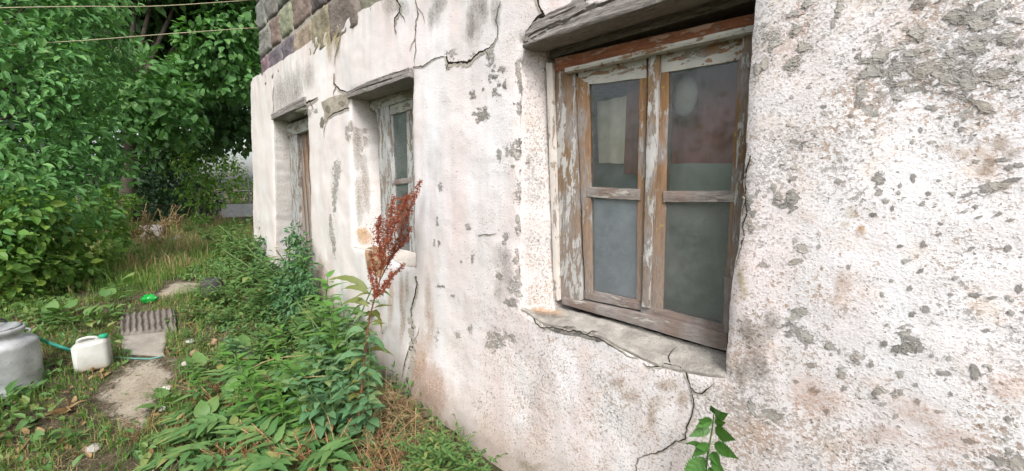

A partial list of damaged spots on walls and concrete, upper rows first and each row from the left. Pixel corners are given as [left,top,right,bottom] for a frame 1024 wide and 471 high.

crack [305,24,349,139]
crack [394,0,501,70]
peeling [468,42,527,124]
peeling [846,0,1024,132]
peeling [329,157,343,254]
crack [735,155,753,268]
peeling [871,171,917,211]
crack [401,276,419,397]
crack [533,318,715,471]
peeling [780,307,874,392]
peeling [869,371,921,407]
peeling [881,305,934,358]